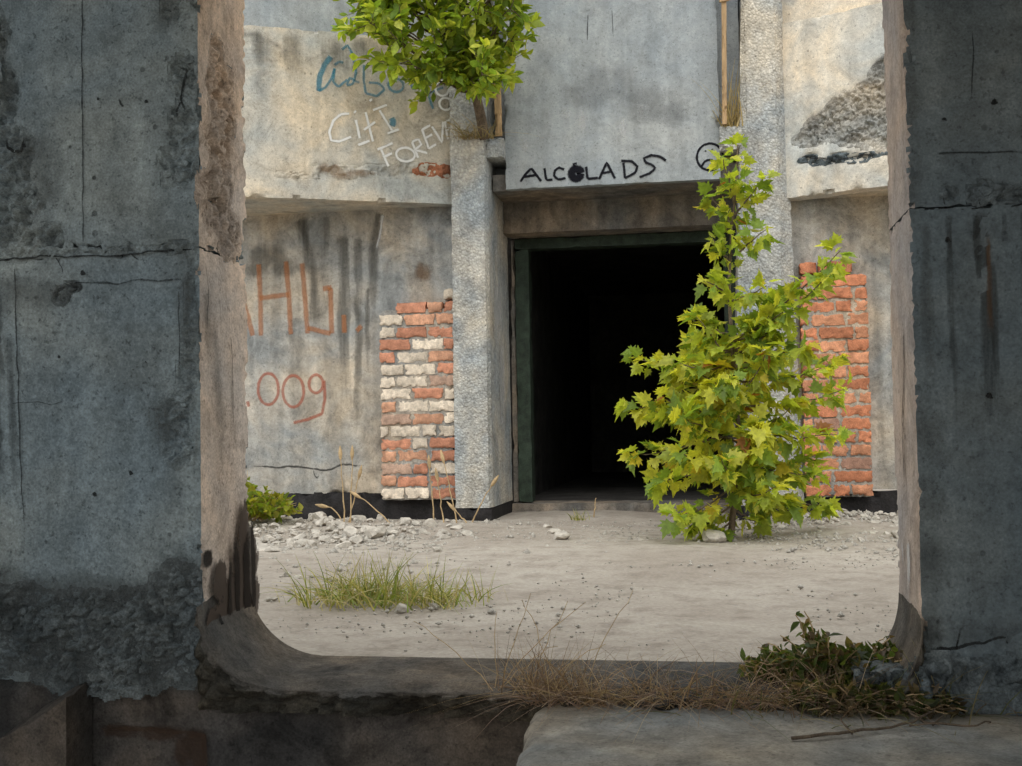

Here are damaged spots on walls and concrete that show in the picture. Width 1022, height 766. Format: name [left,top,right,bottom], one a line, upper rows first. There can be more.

spalling [0,3,73,259]
spalling [51,270,85,307]
crack [0,0,192,518]
spalling [155,245,201,471]
spalling [157,32,242,264]
spalling [791,54,888,167]
crack [923,198,1022,210]
crack [939,148,1013,156]
spalling [0,499,260,702]
spalling [908,650,1022,704]